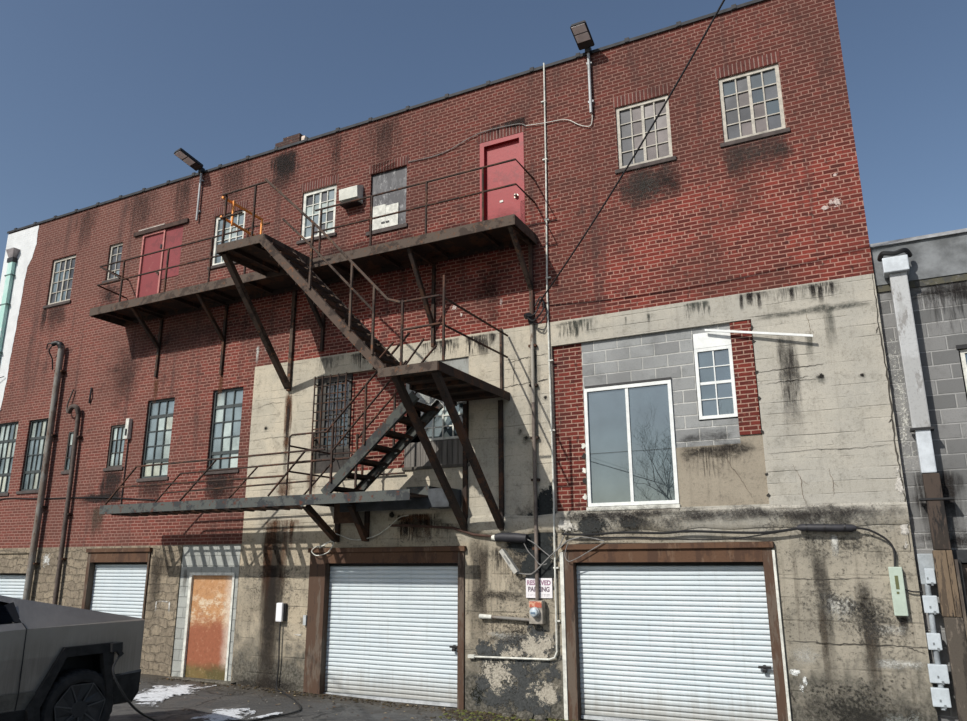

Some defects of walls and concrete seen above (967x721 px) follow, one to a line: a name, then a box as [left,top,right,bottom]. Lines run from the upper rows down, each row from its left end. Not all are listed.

leakage [271,152,296,180]
leakage [769,282,855,316]
leakage [688,434,749,457]
leakage [564,504,918,667]
peeling [472,624,563,716]
leakage [802,678,919,721]